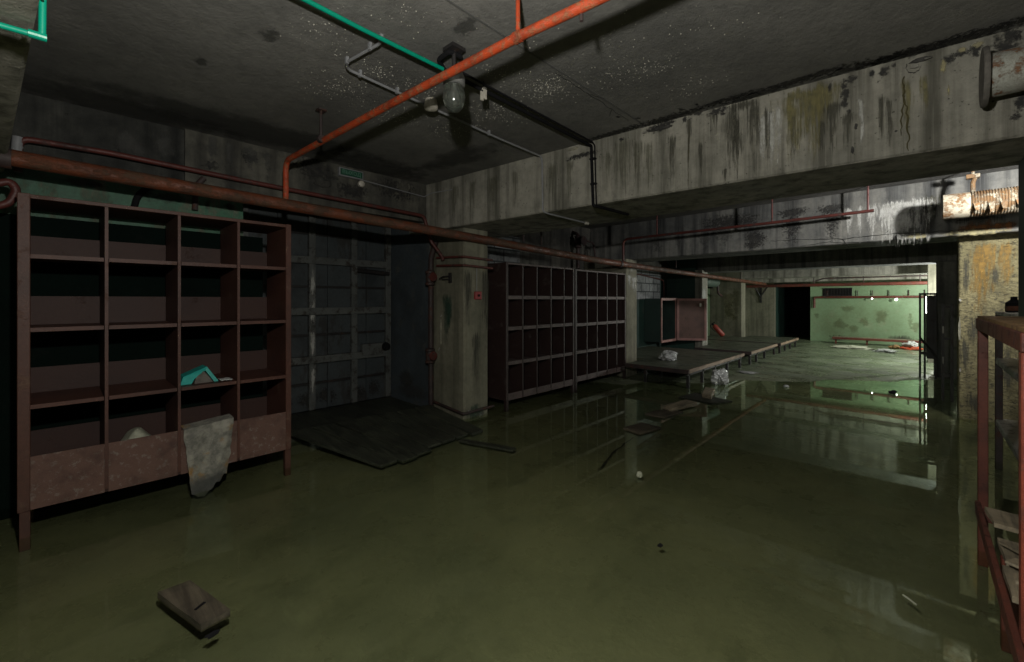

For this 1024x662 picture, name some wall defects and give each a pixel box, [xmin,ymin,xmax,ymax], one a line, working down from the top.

leakage [567,17,1024,177]
crack [900,64,919,151]
leakage [778,195,941,243]
leakage [948,215,1007,235]